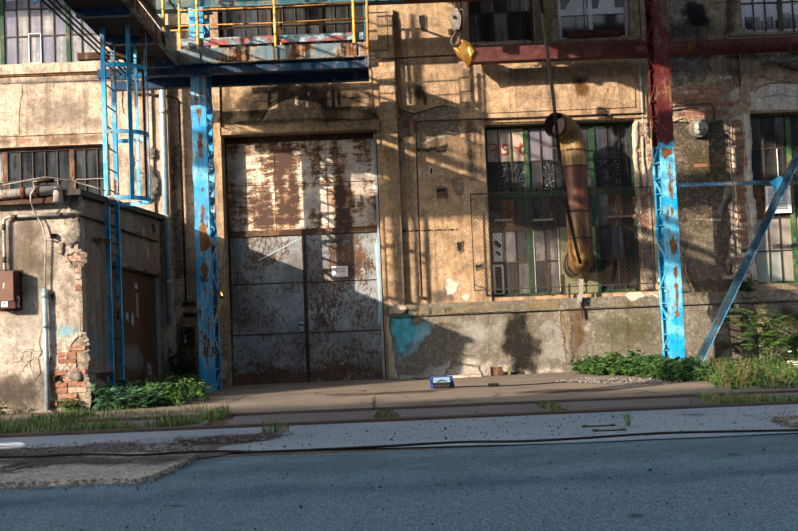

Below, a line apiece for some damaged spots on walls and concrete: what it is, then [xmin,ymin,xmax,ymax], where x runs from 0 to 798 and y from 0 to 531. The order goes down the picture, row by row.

spalling [396,103,462,142]
spalling [669,52,798,296]
rust [200,205,211,251]
rust [200,262,208,282]
flaking render [49,196,107,412]
damp [398,358,529,379]
damp [539,321,567,373]